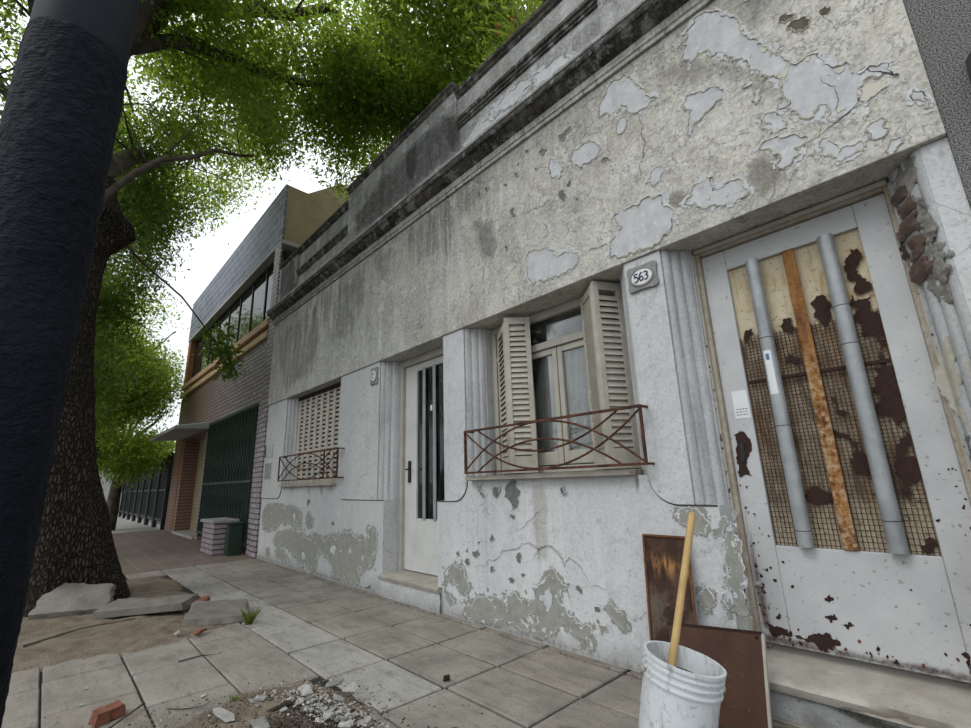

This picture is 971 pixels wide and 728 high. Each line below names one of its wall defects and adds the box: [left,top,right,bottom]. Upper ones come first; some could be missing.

peeling [595,66,661,135]
peeling [678,6,937,173]
peeling [525,139,610,202]
peeling [606,165,756,260]
spalling [890,156,955,304]
corrosion [810,295,832,329]
corrosion [805,486,833,505]
corrosion [833,430,870,476]
peeling [262,498,378,591]
peeling [441,534,632,673]
crack [479,510,605,590]
peeling [670,506,760,627]